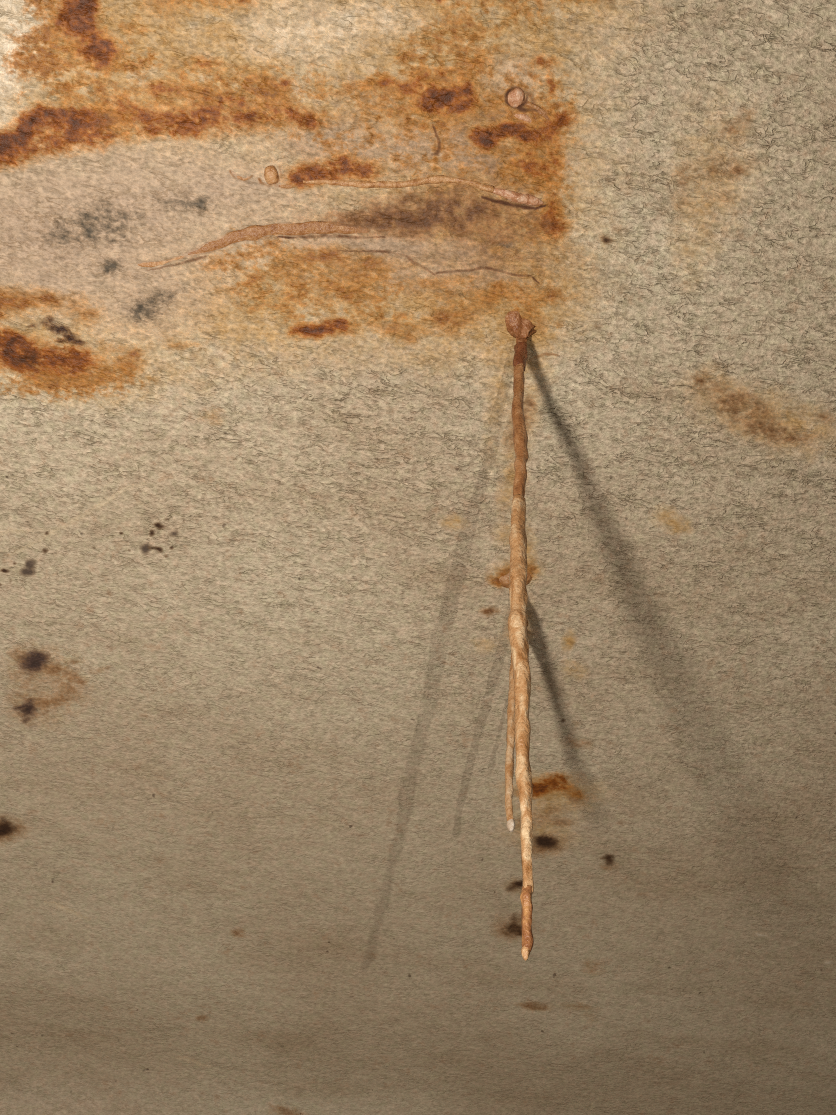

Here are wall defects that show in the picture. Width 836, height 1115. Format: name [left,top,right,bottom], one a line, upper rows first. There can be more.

corrosion [0,0,576,242]
corrosion [206,240,564,342]
corrosion [0,289,143,400]
corrosion [489,565,510,587]
water stain [14,651,84,722]
water stain [0,819,21,840]
corrosion [518,774,582,853]